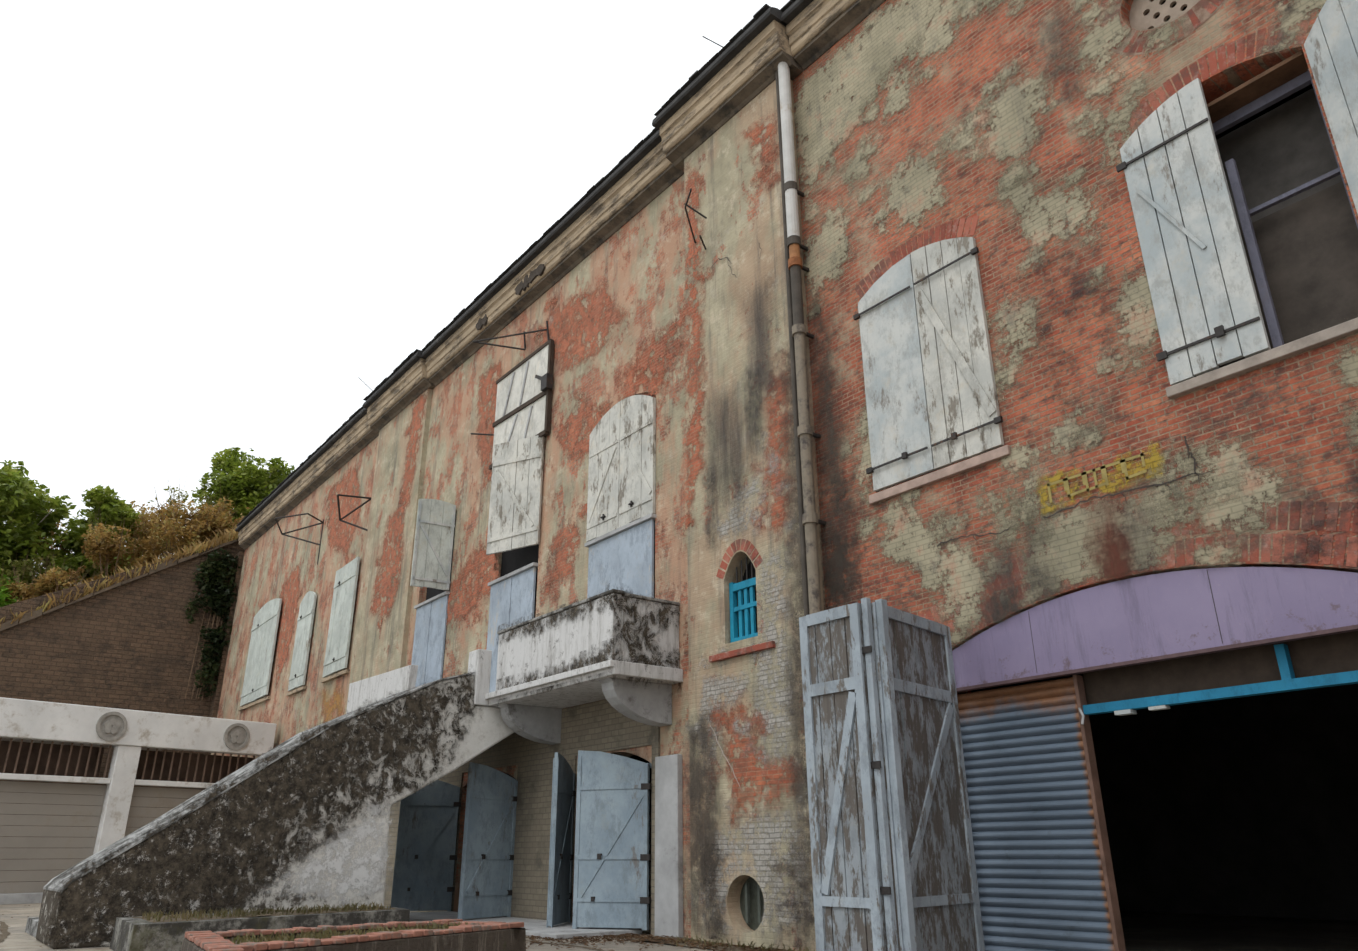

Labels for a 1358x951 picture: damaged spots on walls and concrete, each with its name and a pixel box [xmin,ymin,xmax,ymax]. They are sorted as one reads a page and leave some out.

flaking render [793,0,1187,321]
mould [44,672,476,944]
flaking render [276,566,302,688]
mould [497,585,681,700]
flaking render [557,167,715,535]
damp [684,718,720,936]
damp [711,401,741,484]
peeling [687,553,814,930]
damp [751,293,861,923]
flaking render [838,398,1284,645]
crack [937,436,1213,547]
flaking render [1083,263,1158,376]